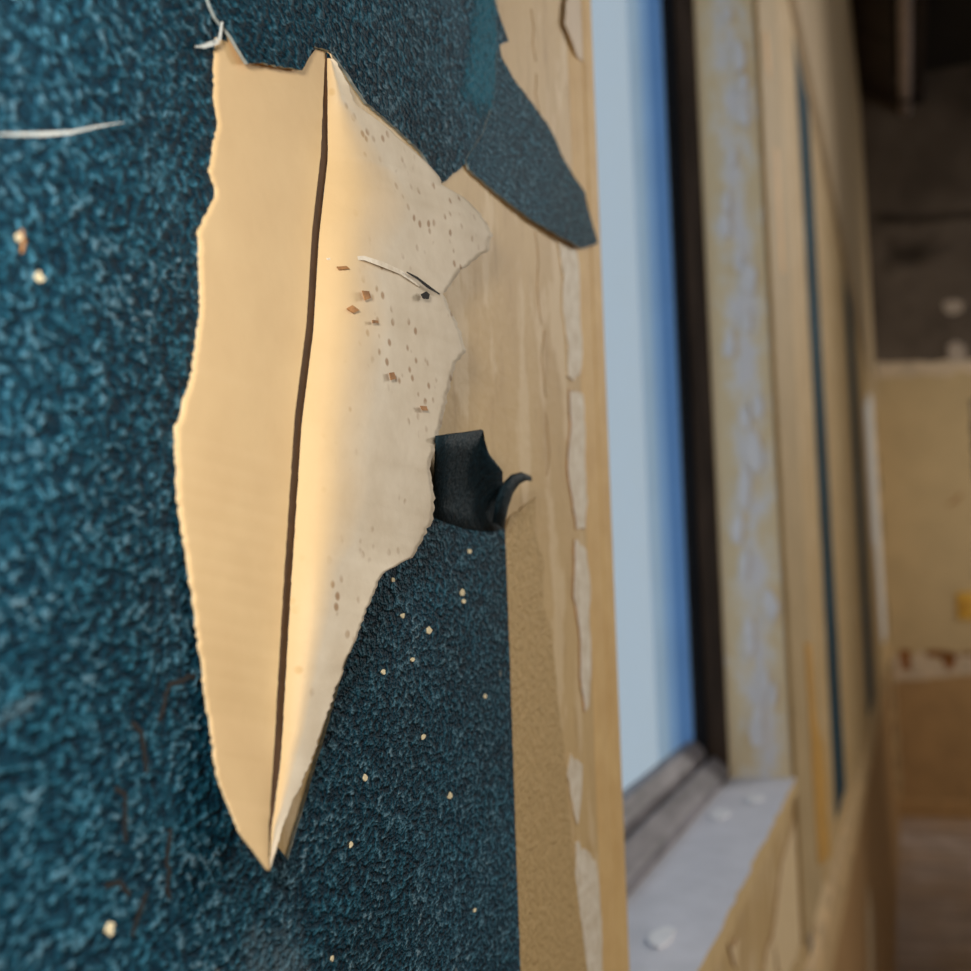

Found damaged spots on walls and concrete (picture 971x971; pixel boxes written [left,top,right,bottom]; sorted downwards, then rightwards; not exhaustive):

peeling [564,0,583,62]
peeling [173,0,532,871]
peeling [465,49,598,712]